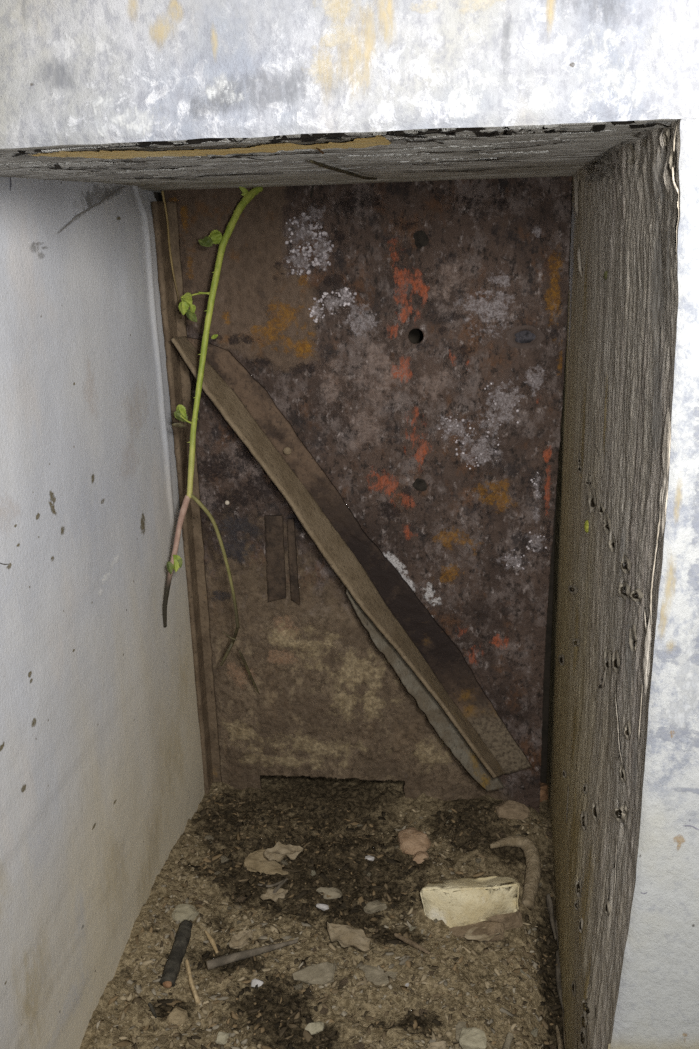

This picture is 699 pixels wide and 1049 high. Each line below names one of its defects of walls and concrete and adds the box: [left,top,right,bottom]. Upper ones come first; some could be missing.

peeling [0,67,650,182]
corrosion [198,445,278,562]